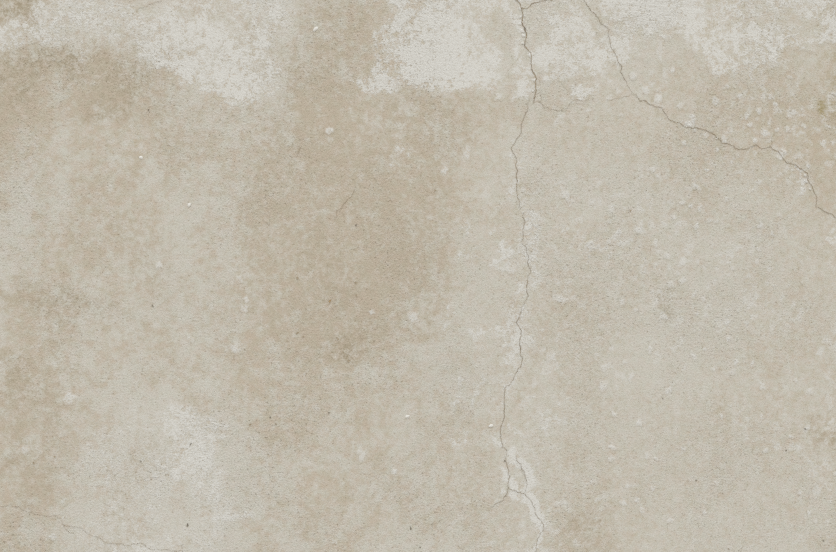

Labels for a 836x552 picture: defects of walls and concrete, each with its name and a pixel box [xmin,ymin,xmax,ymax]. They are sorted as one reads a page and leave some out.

crack [496,0,577,550]
crack [586,3,833,215]